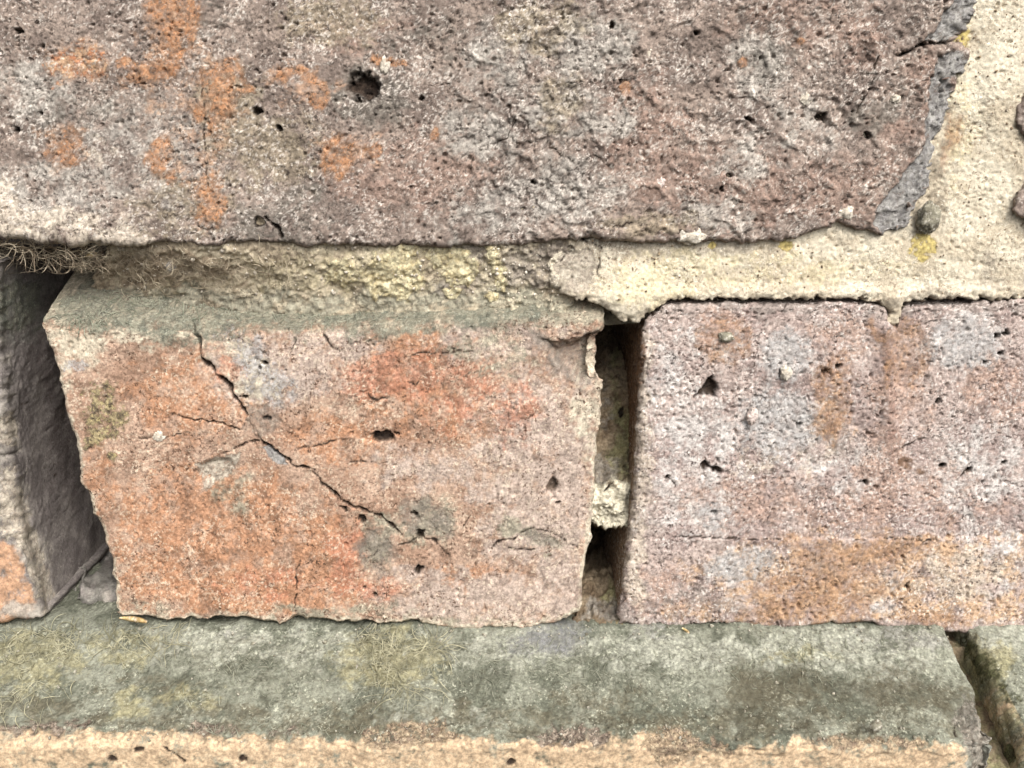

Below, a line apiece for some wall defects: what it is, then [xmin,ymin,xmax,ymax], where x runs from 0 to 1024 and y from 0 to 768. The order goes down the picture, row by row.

crack [143,334,449,558]